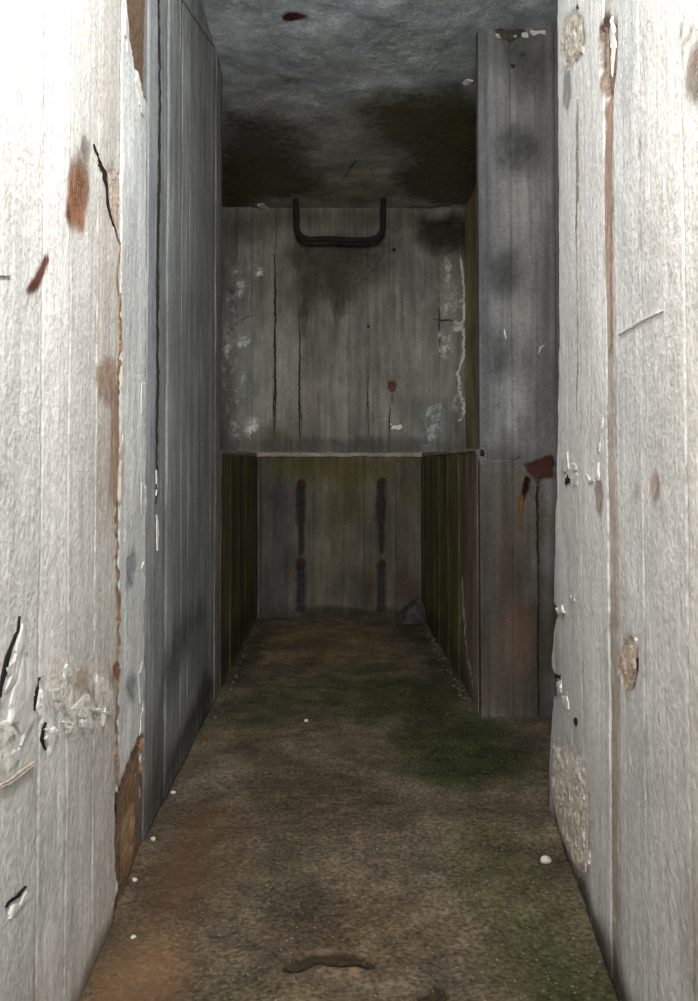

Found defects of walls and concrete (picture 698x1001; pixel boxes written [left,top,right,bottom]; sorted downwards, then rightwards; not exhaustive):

corrosion [283,12,307,21]
corrosion [67,136,89,229]
leakage [222,114,319,207]
corrosion [28,254,49,291]
crack [155,0,215,504]
leakage [365,79,476,446]
leakage [221,266,258,439]
crack [93,144,124,786]
corrosion [519,455,554,513]
peeling [48,652,120,735]
spalling [111,661,144,927]
crack [5,886,29,919]